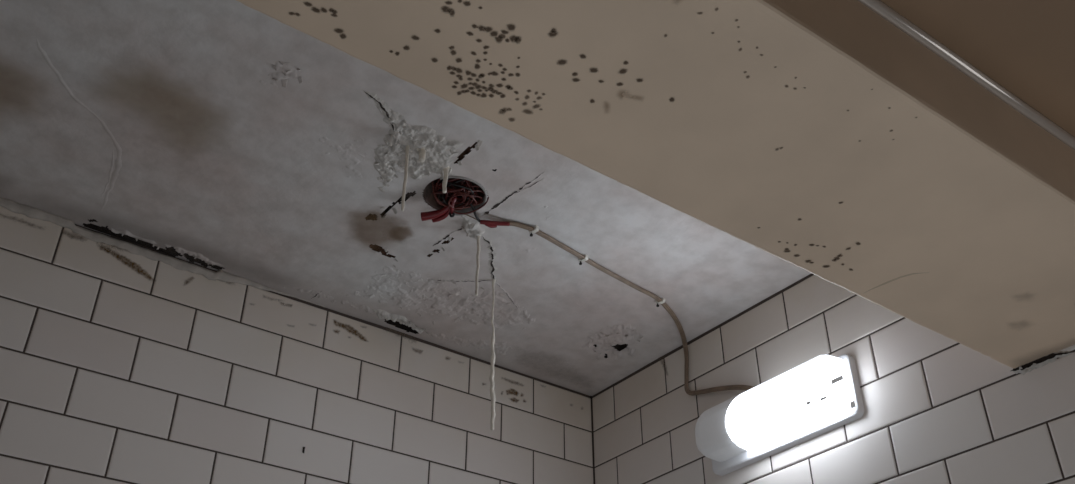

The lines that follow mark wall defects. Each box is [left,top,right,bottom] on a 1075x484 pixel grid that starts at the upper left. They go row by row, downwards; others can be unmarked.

damp [289,2,346,39]
damp [432,25,545,121]
peeling [365,104,483,221]
crack [83,219,225,270]
spalling [369,244,398,262]
crack [430,172,544,307]
peeling [372,309,429,334]